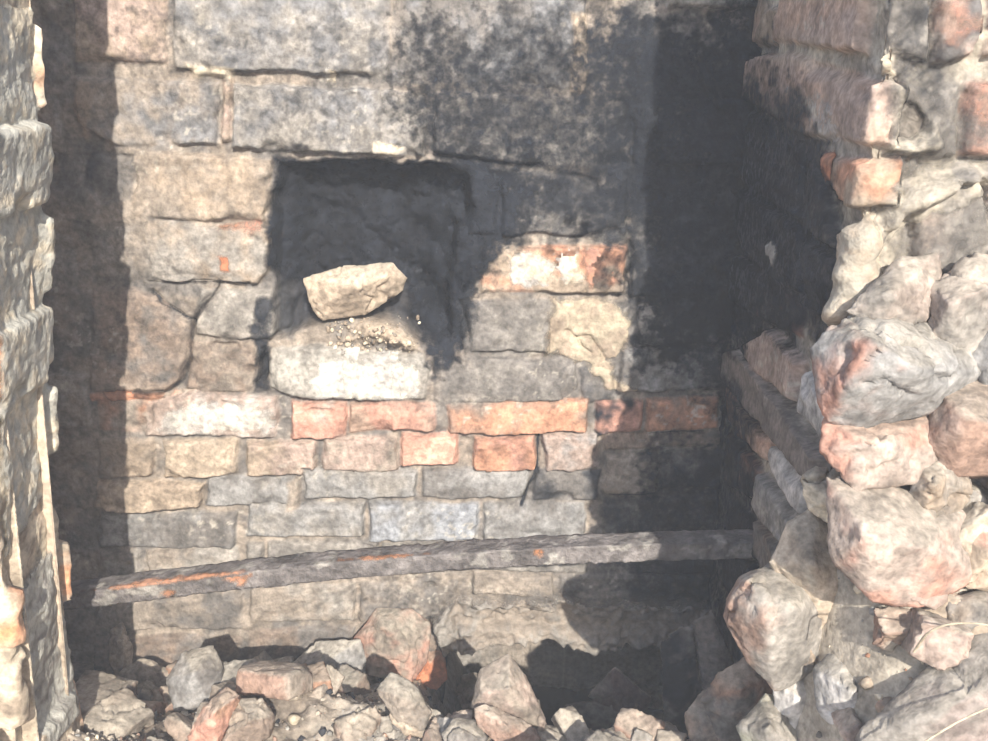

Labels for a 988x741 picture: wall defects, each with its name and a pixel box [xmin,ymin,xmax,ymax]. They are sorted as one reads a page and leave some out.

crack [152,290,196,319]